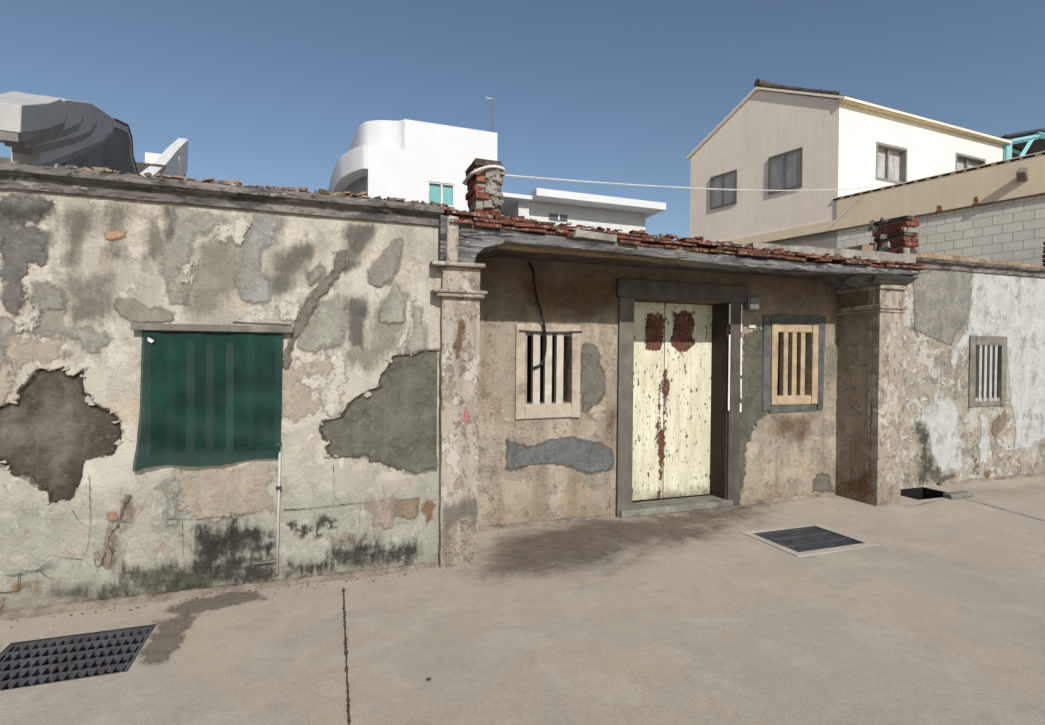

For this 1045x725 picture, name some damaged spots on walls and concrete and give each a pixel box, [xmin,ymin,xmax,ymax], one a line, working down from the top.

spalling [0,285,123,505]
spalling [281,297,437,475]
peeling [920,273,1045,474]
leakage [55,513,417,600]